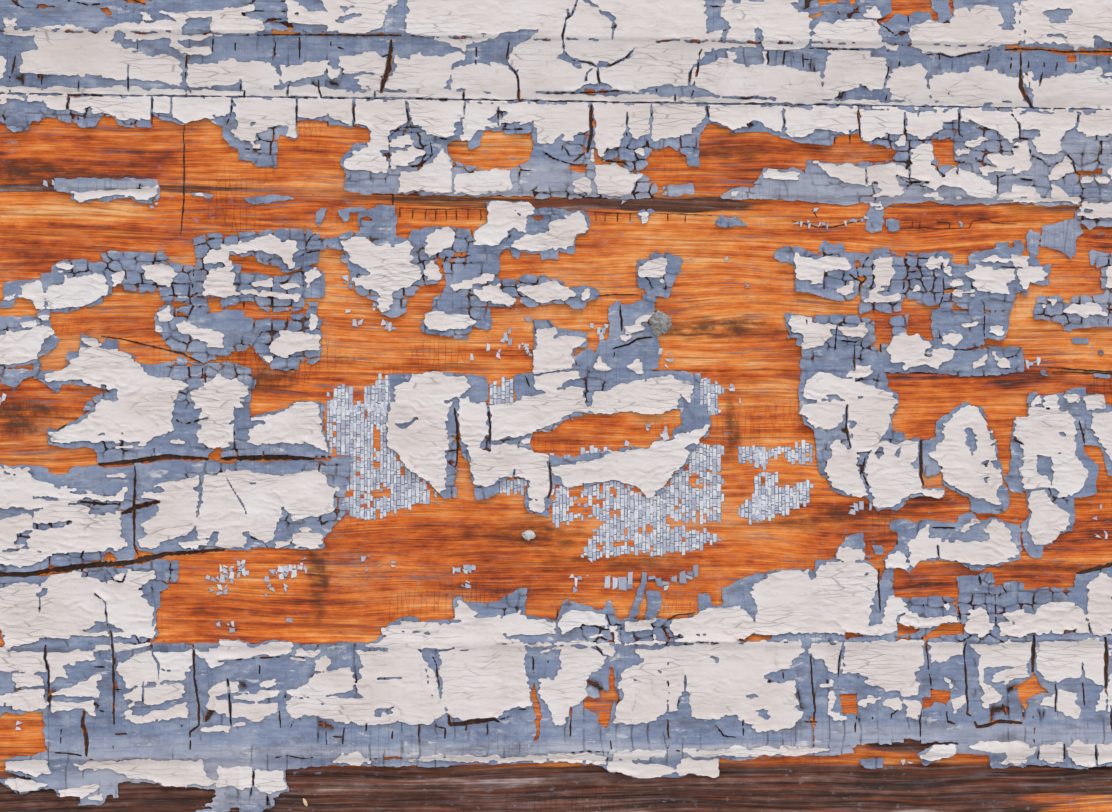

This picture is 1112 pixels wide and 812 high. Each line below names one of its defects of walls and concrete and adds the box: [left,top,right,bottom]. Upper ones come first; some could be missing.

crack [280,40,393,99]
crack [415,4,860,164]
crack [892,53,1106,110]
peeling [372,425,380,469]
peeling [360,483,390,508]
peeling [683,473,709,493]
peeling [893,445,1112,644]
peeling [739,634,772,642]
crack [1102,637,1110,688]
crack [81,630,127,756]
crack [447,715,499,735]
peeling [0,641,1112,812]